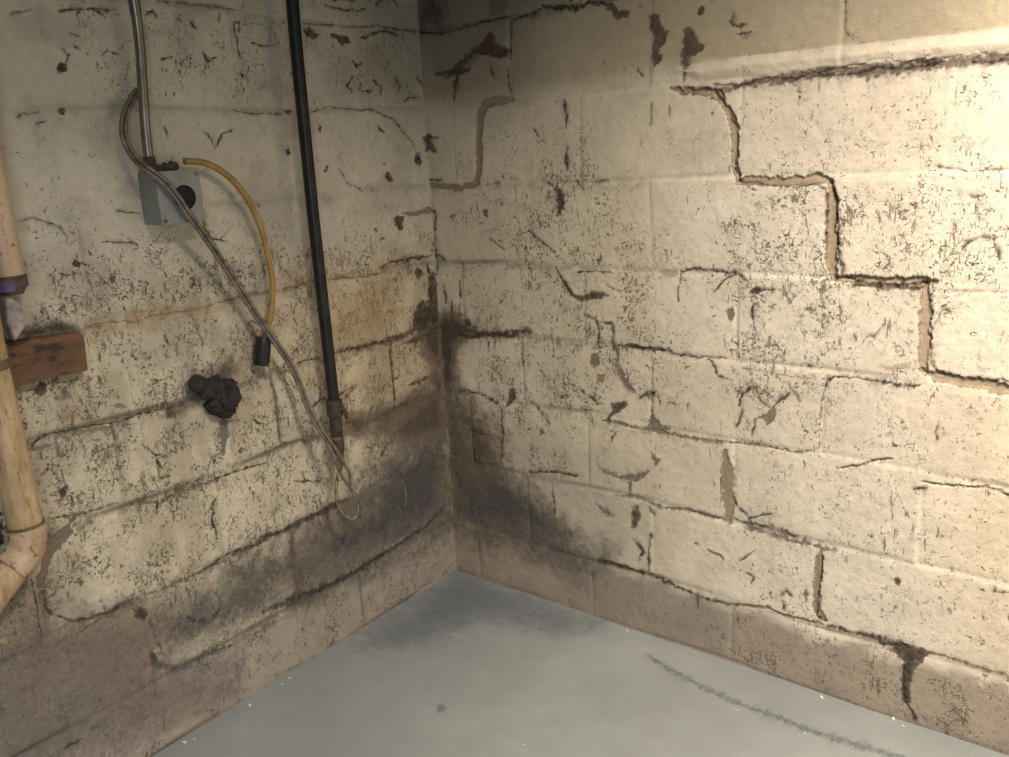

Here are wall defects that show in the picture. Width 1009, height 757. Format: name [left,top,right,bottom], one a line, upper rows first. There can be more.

crack [303,0,606,58]
crack [85,95,514,328]
crack [29,378,345,680]
crack [262,507,444,614]
crack [297,313,433,426]
water stain [168,313,610,636]
crack [461,390,504,459]
crack [457,319,531,346]
crack [529,1,1009,623]
crack [914,648,1005,674]